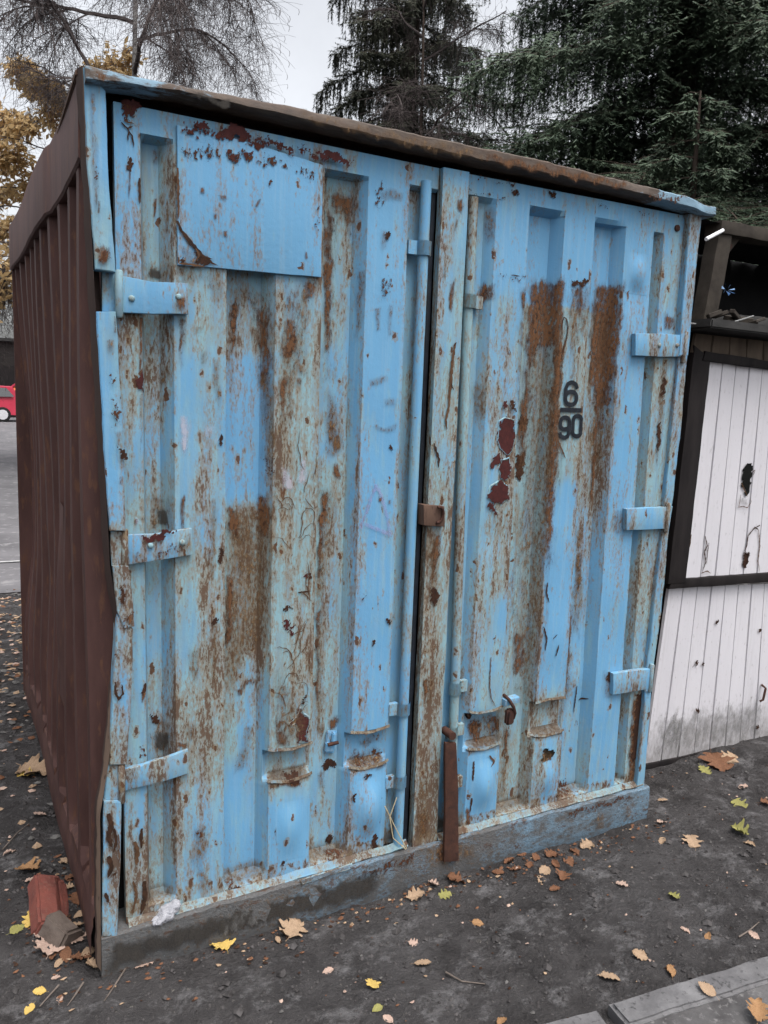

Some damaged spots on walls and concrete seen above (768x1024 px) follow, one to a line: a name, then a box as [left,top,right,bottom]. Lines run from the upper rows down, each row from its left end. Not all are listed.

rust [120,97,142,122]
rust [126,156,141,204]
peeling [181,120,354,173]
rust [229,193,358,477]
peeling [487,400,517,516]
rust [512,278,625,701]
rust [208,496,273,680]
rust [428,535,440,607]
rust [150,714,194,751]
rust [277,770,300,787]
rust [318,758,336,787]
rust [465,713,510,792]